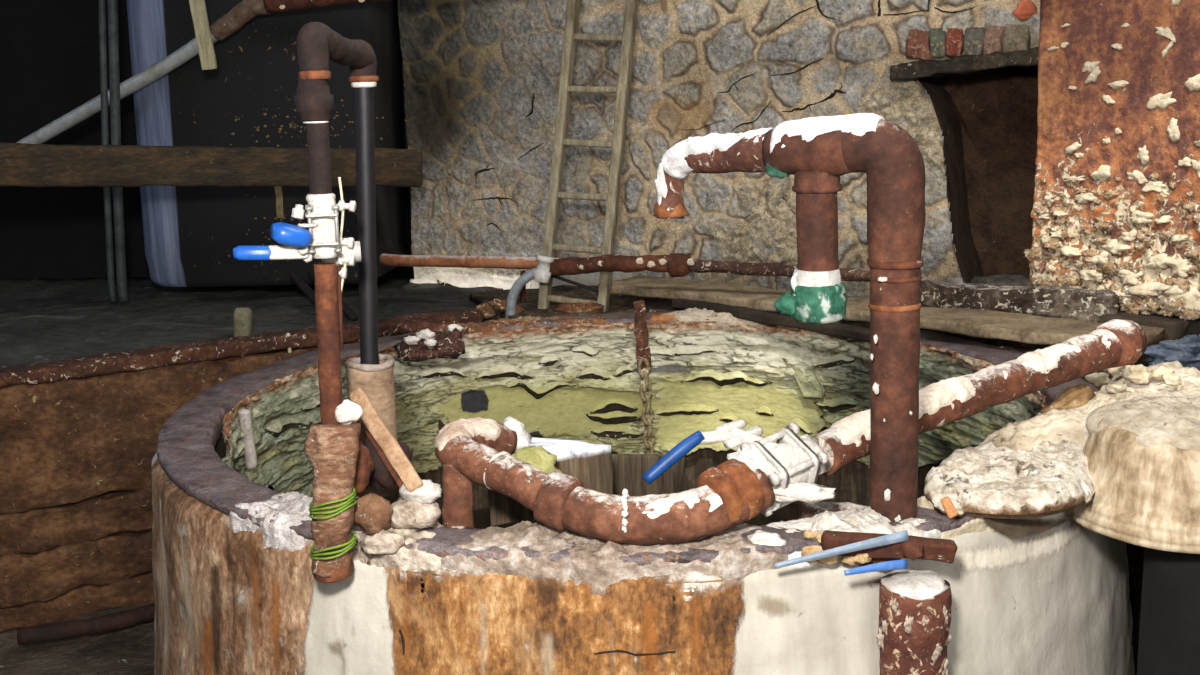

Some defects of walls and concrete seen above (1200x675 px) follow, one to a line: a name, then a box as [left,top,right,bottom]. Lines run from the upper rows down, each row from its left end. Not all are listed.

crack [767,0,836,36]
crack [680,58,846,131]
corrosion [1022,0,1200,321]
peeling [418,345,635,399]
peeling [586,397,738,438]
peeling [650,345,727,356]
peeling [681,369,772,386]
peeling [756,406,774,416]
peeling [782,353,859,434]
leakage [229,491,313,552]
corrosion [385,566,745,675]